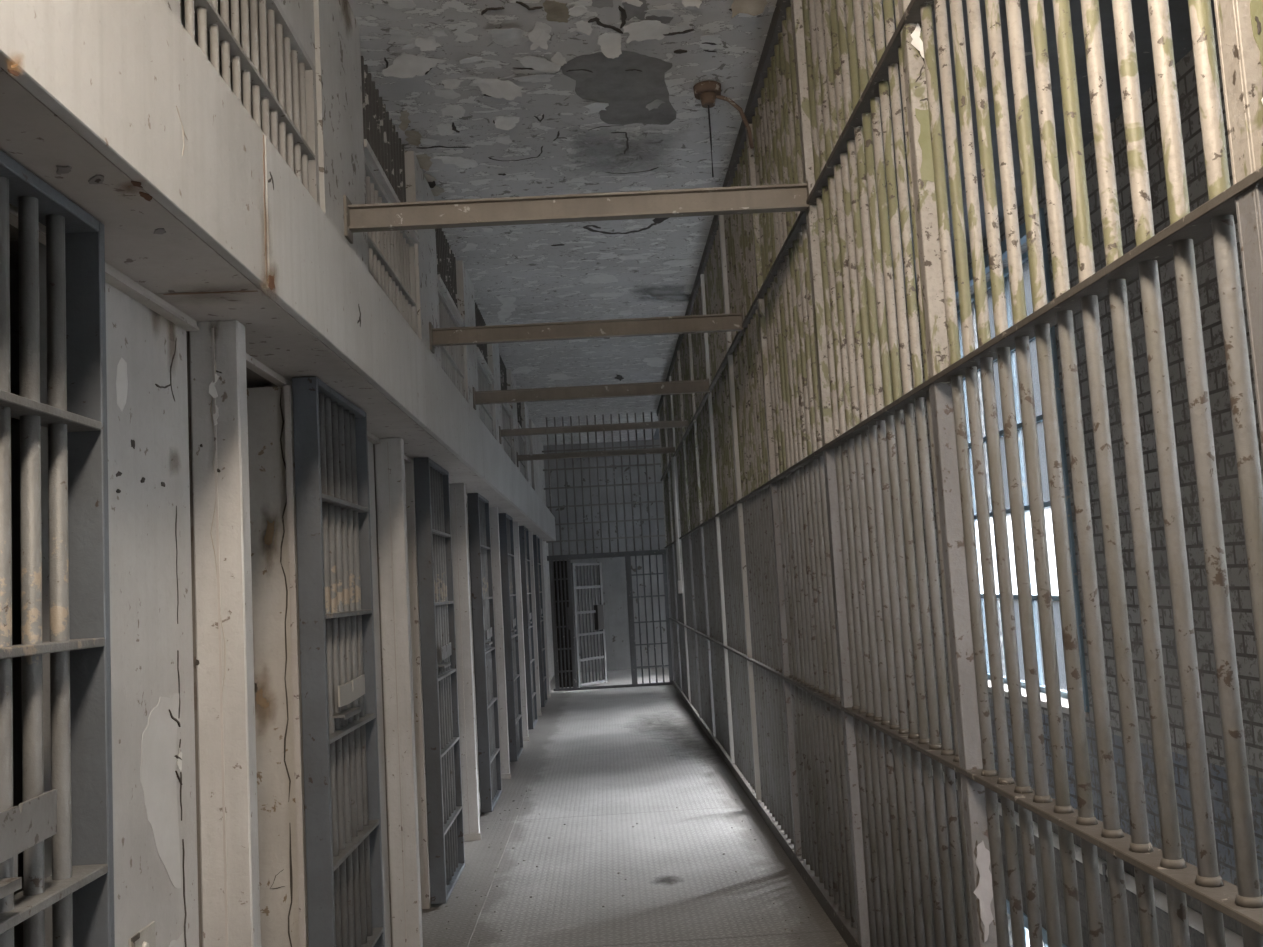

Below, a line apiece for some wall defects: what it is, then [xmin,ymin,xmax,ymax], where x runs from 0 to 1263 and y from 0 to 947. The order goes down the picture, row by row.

peeling [382,28,482,78]
peeling [399,0,721,196]
peeling [1250,0,1263,104]
rust [163,135,275,295]
peeling [140,693,182,888]